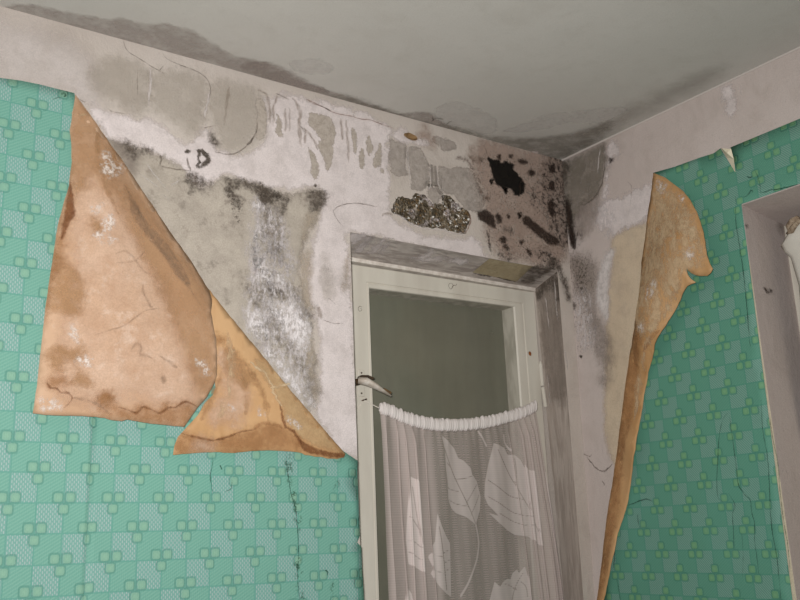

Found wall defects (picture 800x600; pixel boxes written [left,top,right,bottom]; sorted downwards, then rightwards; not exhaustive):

leakage [70,19,330,96]
peeling [33,94,345,459]
leakage [185,137,219,187]
leakage [225,178,315,407]
leakage [303,184,327,238]
peeling [351,127,484,235]
leakage [421,113,447,128]
leakage [459,140,619,358]
peeling [596,173,713,600]